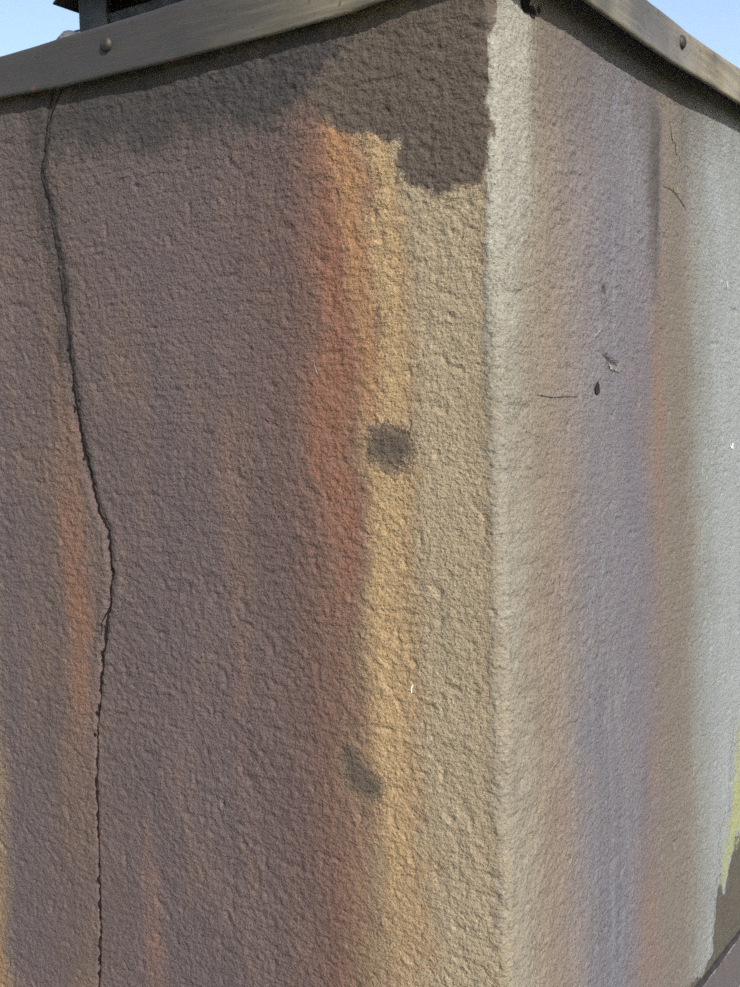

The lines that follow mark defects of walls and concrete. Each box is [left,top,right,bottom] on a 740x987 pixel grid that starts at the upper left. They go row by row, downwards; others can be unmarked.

crack [41,89,114,987]
leakage [303,0,545,987]
leakage [642,67,740,987]